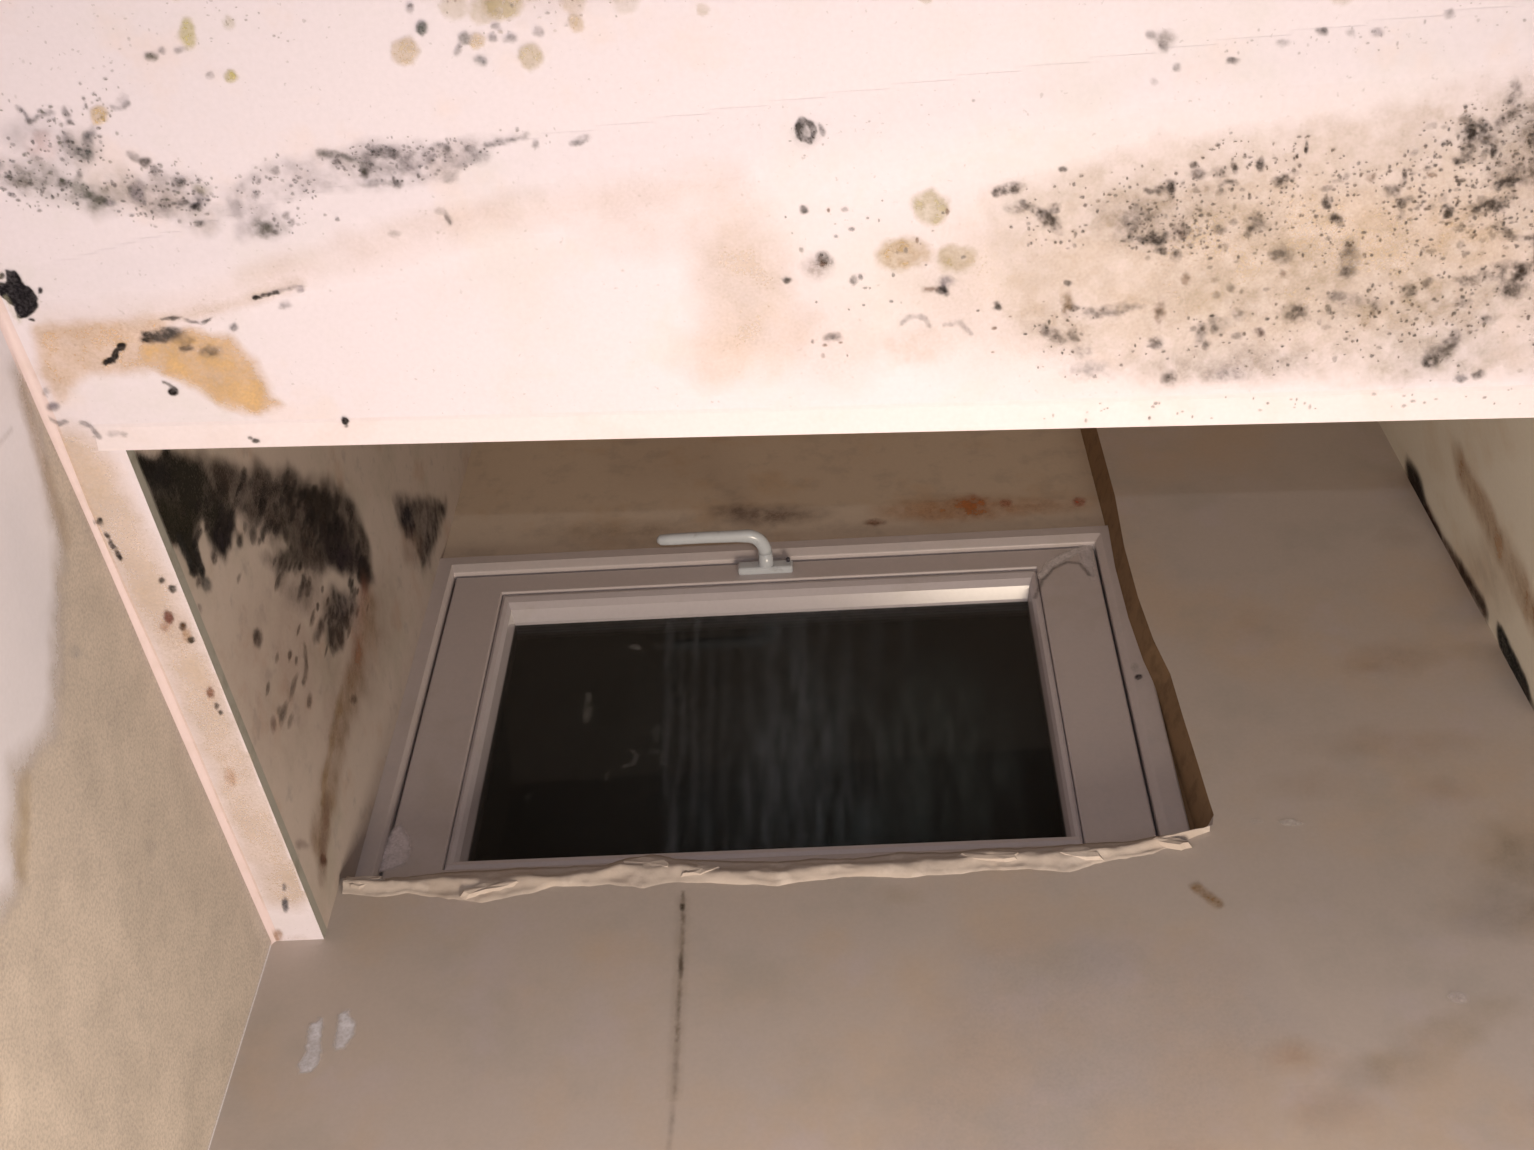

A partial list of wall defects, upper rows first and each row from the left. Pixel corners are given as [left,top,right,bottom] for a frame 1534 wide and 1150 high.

mould [400,23,426,63]
damp [8,100,115,209]
damp [322,147,449,186]
mould [993,104,1534,275]
damp [103,317,271,412]
mould [1337,239,1534,382]
damp [64,443,163,614]
damp [137,449,371,654]
mould [399,500,445,565]